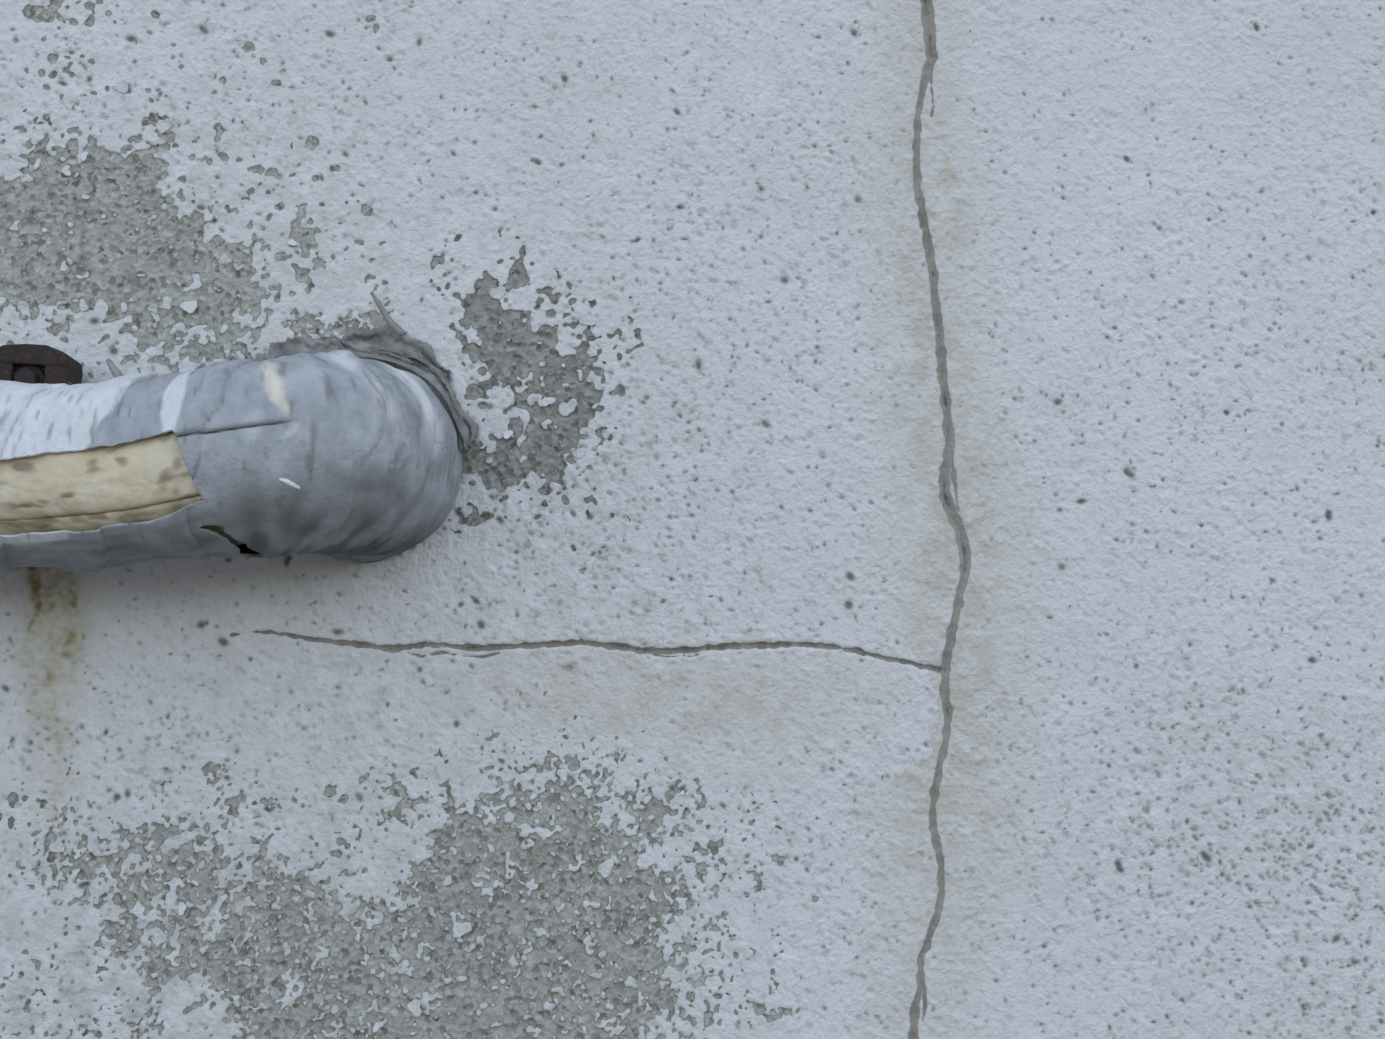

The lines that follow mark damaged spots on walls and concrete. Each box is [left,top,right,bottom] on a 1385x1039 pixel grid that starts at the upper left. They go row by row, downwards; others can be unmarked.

peeling [0,0,394,378]
peeling [429,228,644,534]
crack [230,0,971,1039]
peeling [0,715,793,1039]